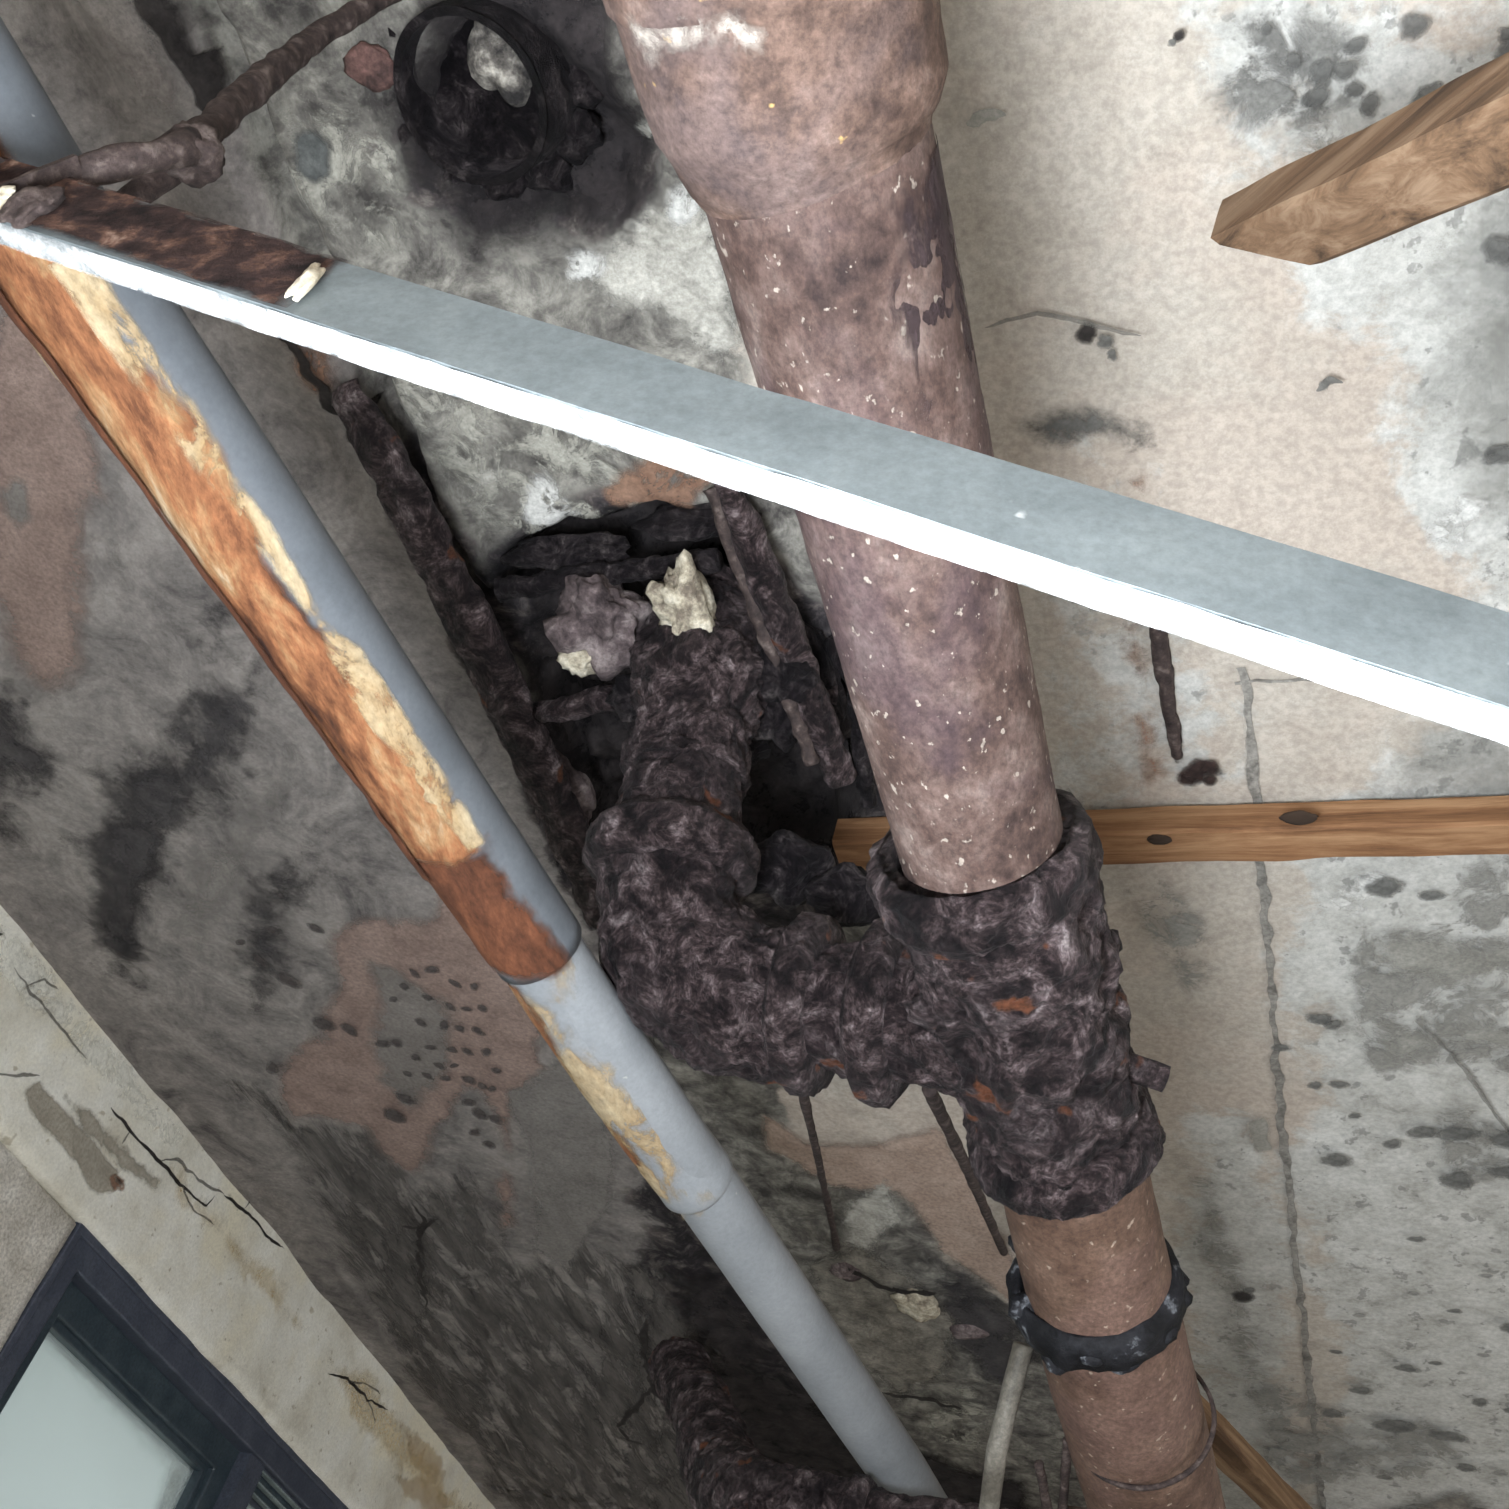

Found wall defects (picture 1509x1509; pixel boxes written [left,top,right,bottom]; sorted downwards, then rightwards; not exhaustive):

peeling [1168,30,1184,46]
leakage [1224,19,1379,153]
leakage [1400,14,1431,40]
leakage [570,185,738,351]
leakage [1482,237,1509,266]
leakage [1482,445,1509,464]
spalling [0,185,1509,928]
leakage [0,700,52,795]
leakage [86,672,255,977]
peeling [235,939,302,988]
peeling [266,897,614,1269]
crack [111,1108,283,1247]